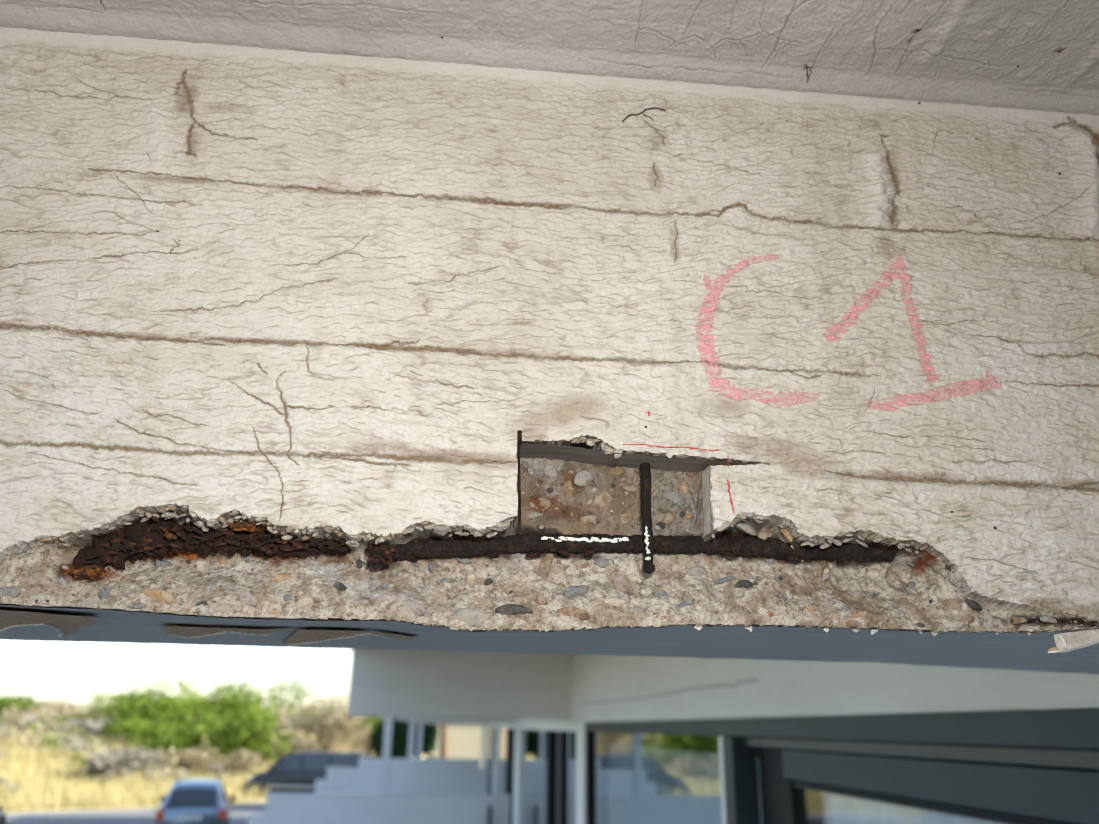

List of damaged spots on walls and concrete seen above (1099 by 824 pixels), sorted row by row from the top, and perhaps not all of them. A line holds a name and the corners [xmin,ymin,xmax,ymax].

spalling [0,430,1099,653]